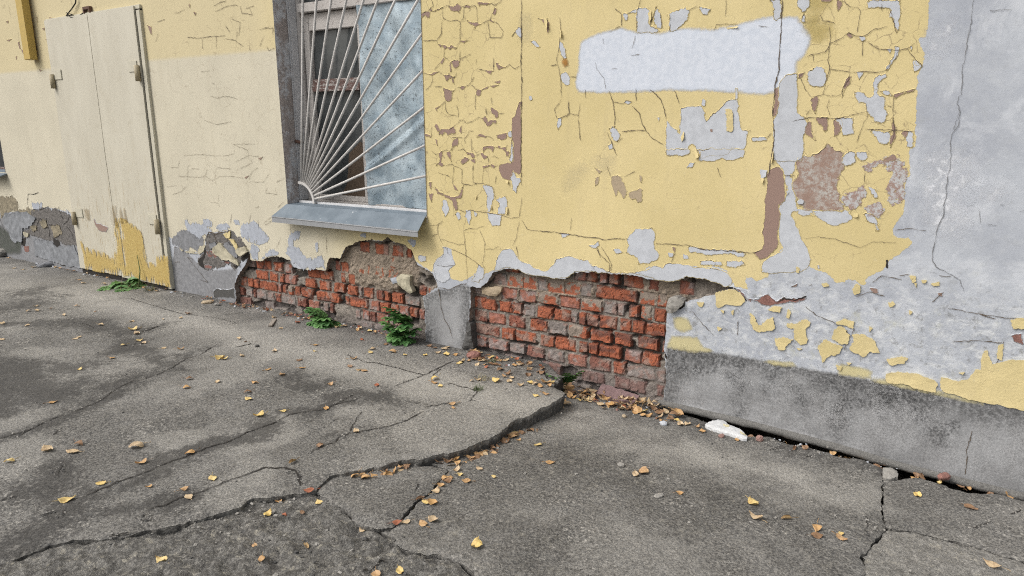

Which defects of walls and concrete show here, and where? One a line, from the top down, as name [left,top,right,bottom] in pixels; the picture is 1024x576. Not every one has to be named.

peeling [538,17,580,138]
peeling [609,0,711,34]
peeling [770,0,782,21]
peeling [797,0,811,23]
spalling [0,192,455,339]
crack [41,0,621,537]
spalling [462,73,1024,411]
crack [932,1,1014,363]
crack [2,346,213,438]